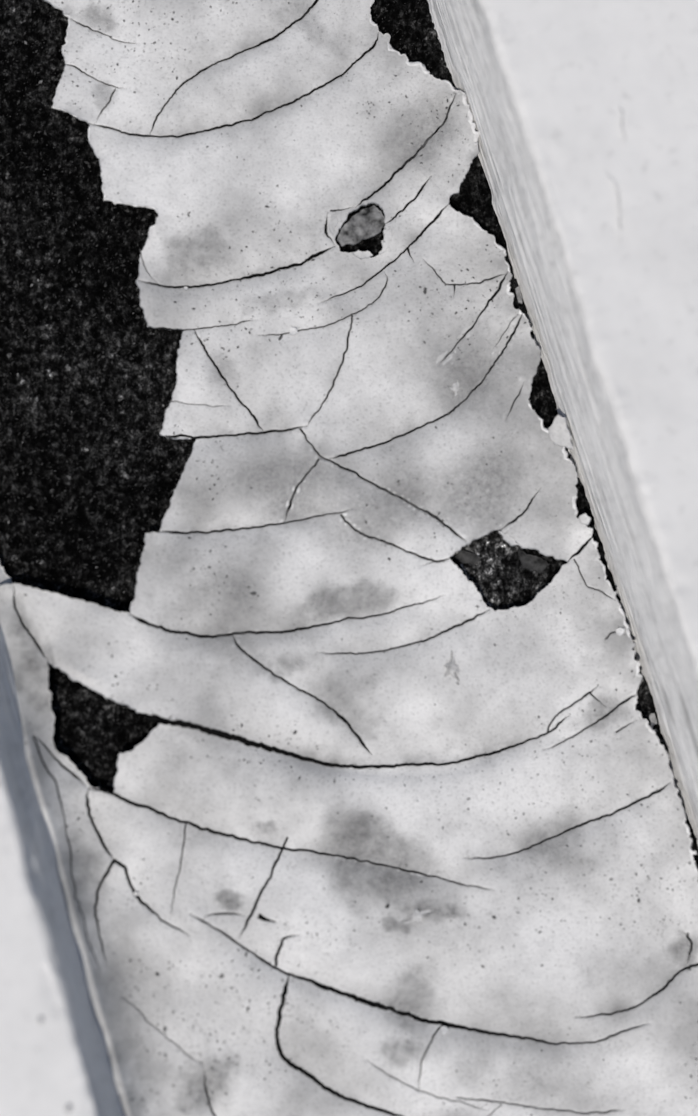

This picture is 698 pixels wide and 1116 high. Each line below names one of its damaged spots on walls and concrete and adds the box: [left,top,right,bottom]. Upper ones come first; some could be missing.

crack [63,0,379,138]
peeling [44,0,480,440]
spalling [448,155,513,275]
crack [137,94,524,567]
peeling [159,205,598,562]
crack [13,592,47,658]
crack [130,595,638,769]
crack [501,489,540,530]
crack [567,532,613,599]
peeling [0,514,698,1116]
crack [33,736,698,1116]